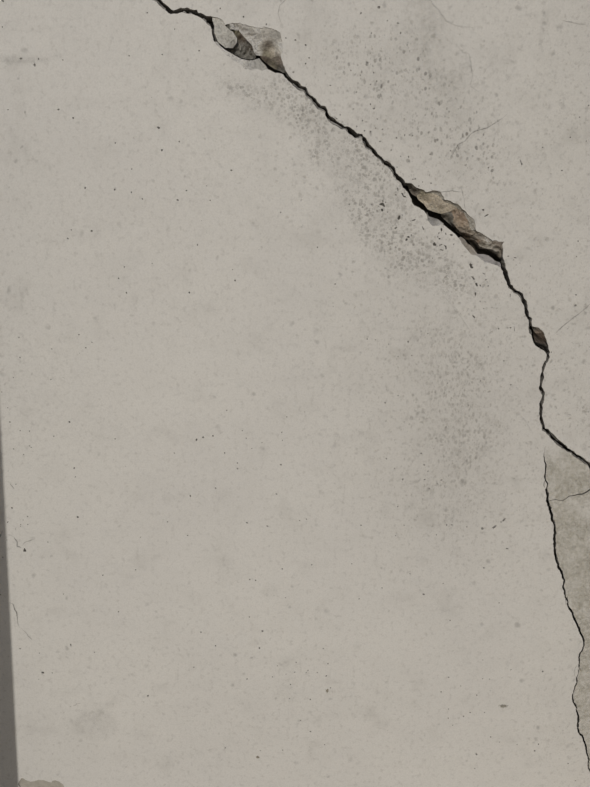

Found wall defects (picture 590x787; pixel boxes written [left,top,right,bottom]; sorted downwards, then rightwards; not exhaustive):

spalling [212,17,286,73]
spalling [395,183,516,296]
crack [154,0,590,771]
spalling [529,325,548,353]